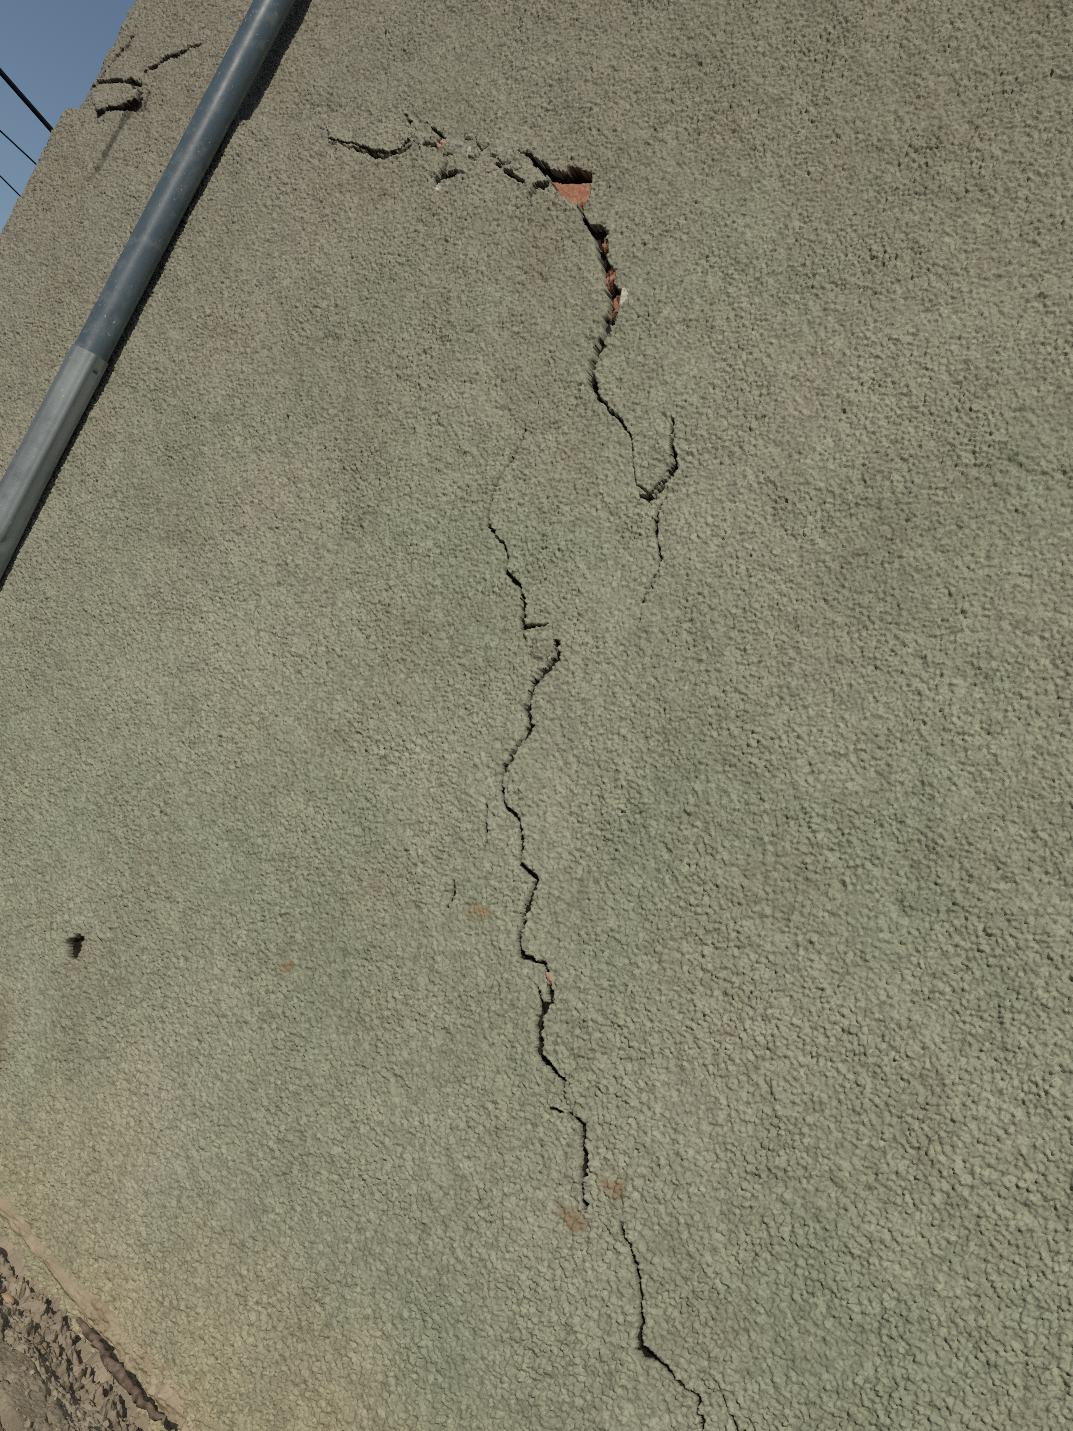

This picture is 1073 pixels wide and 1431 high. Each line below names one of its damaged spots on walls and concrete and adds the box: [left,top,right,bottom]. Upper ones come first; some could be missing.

crack [90,48,196,116]
crack [507,159,678,603]
crack [486,499,589,1207]
crack [621,1227,746,1431]